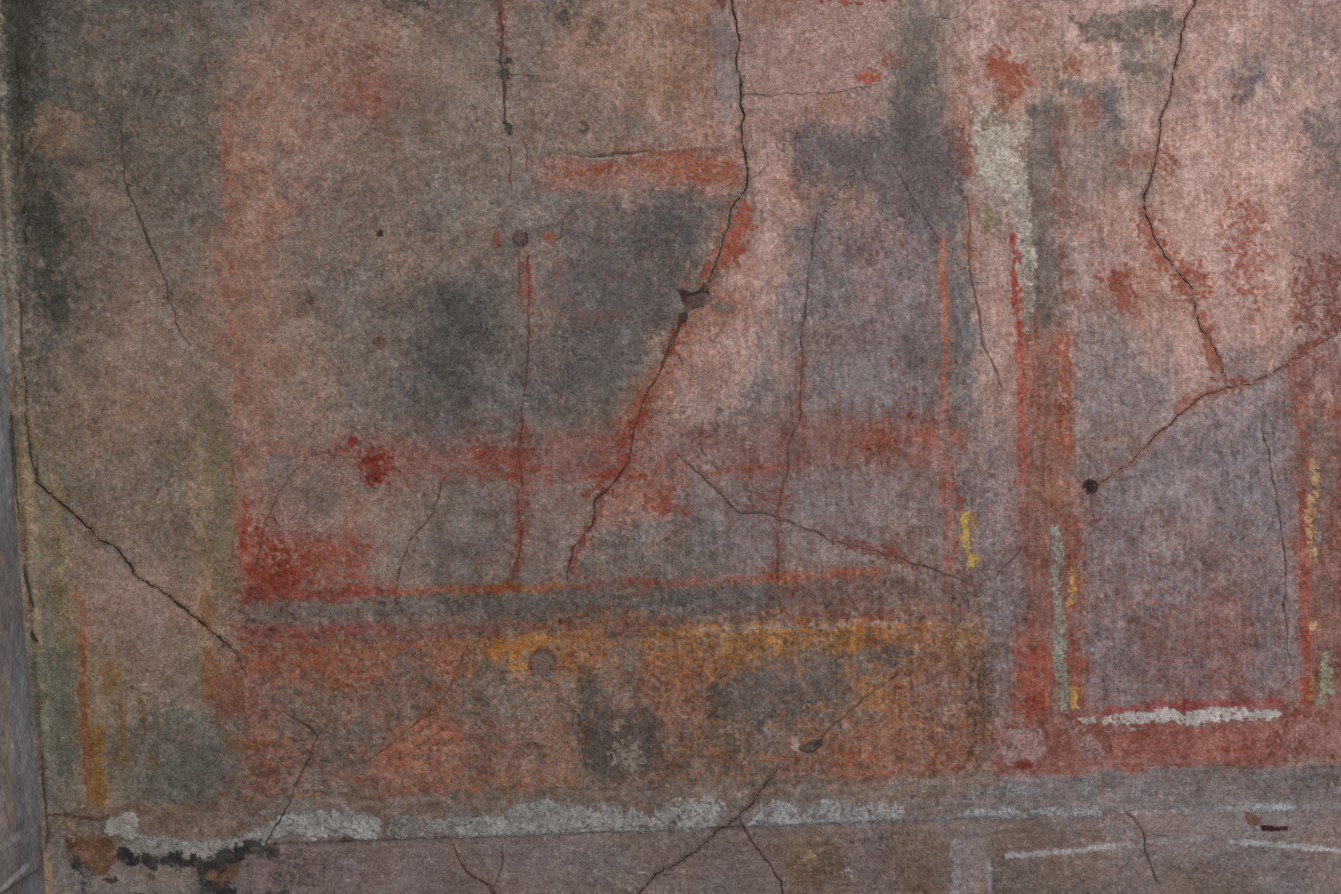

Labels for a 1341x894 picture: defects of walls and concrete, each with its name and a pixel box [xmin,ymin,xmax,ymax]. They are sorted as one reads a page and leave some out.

crack [10,290,248,676]
leakage [389,181,721,436]
crack [567,0,879,576]
crack [676,205,1027,616]
crack [893,163,1004,390]
crack [1046,0,1341,512]
crack [42,754,51,847]
leakage [115,795,727,894]
crack [451,838,507,894]
crack [636,767,784,894]
leakage [745,780,1103,829]